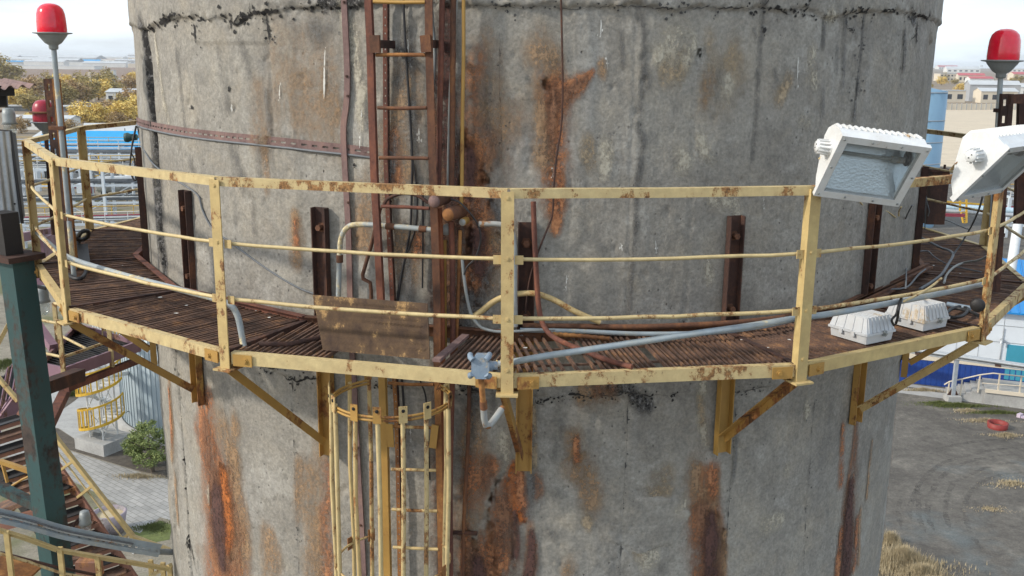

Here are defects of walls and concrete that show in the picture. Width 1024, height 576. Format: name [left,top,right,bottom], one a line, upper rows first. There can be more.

damp [339,3,369,130]
rust [528,37,606,235]
rust [195,389,249,576]
rust [493,462,543,576]
rust [690,461,727,576]
rust [835,421,873,576]